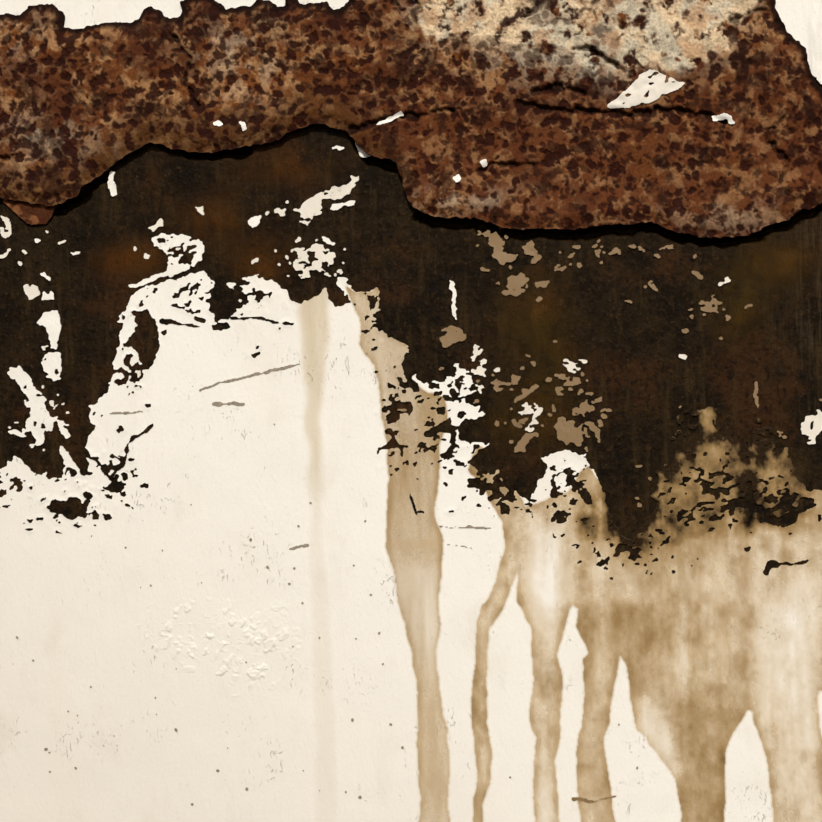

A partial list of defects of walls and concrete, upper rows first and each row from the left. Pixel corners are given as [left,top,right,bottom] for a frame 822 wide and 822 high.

rust [0,0,822,239]
peeling [0,124,822,580]